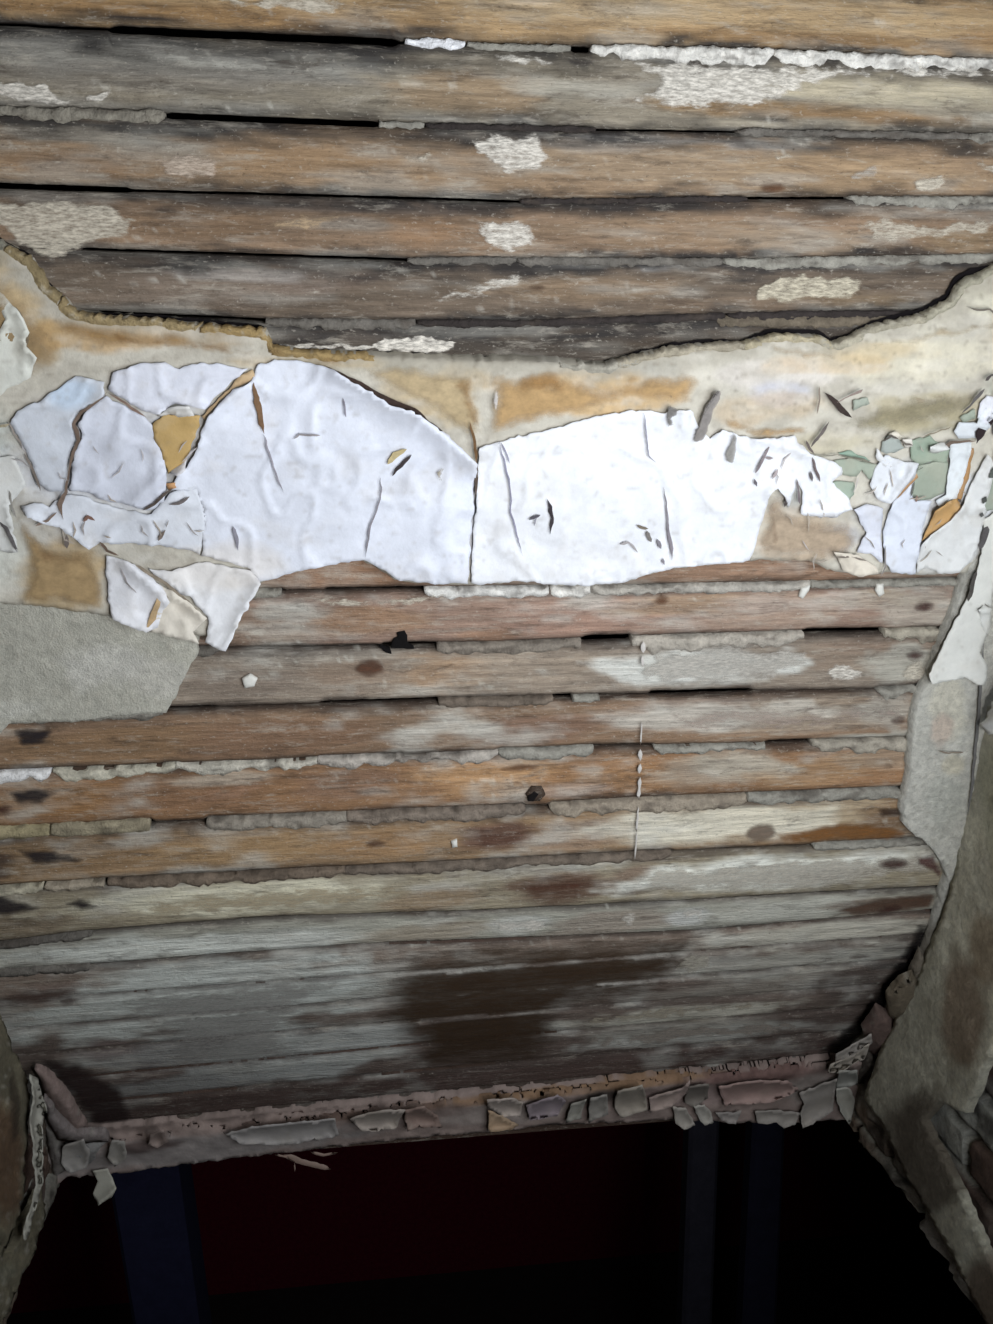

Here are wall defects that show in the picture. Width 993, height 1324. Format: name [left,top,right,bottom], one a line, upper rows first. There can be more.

peeling [0,239,993,734]
damp [843,895,933,914]
damp [9,992,68,1004]
damp [390,945,678,1062]
spalling [487,701,993,1324]
damp [830,928,926,1051]
spalling [0,1014,127,1324]
damp [45,1062,129,1124]
peeling [226,1106,442,1145]